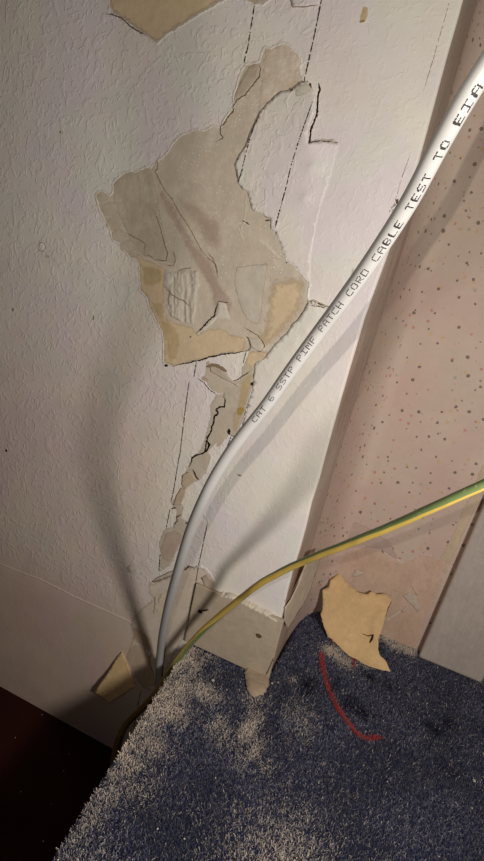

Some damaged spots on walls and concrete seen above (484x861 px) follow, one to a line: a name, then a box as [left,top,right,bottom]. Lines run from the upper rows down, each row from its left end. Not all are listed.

crack [309,83,338,144]
crack [190,301,228,338]
flaking render [202,302,230,330]
crack [165,350,254,480]
peeling [173,472,196,505]
peeling [127,564,215,691]